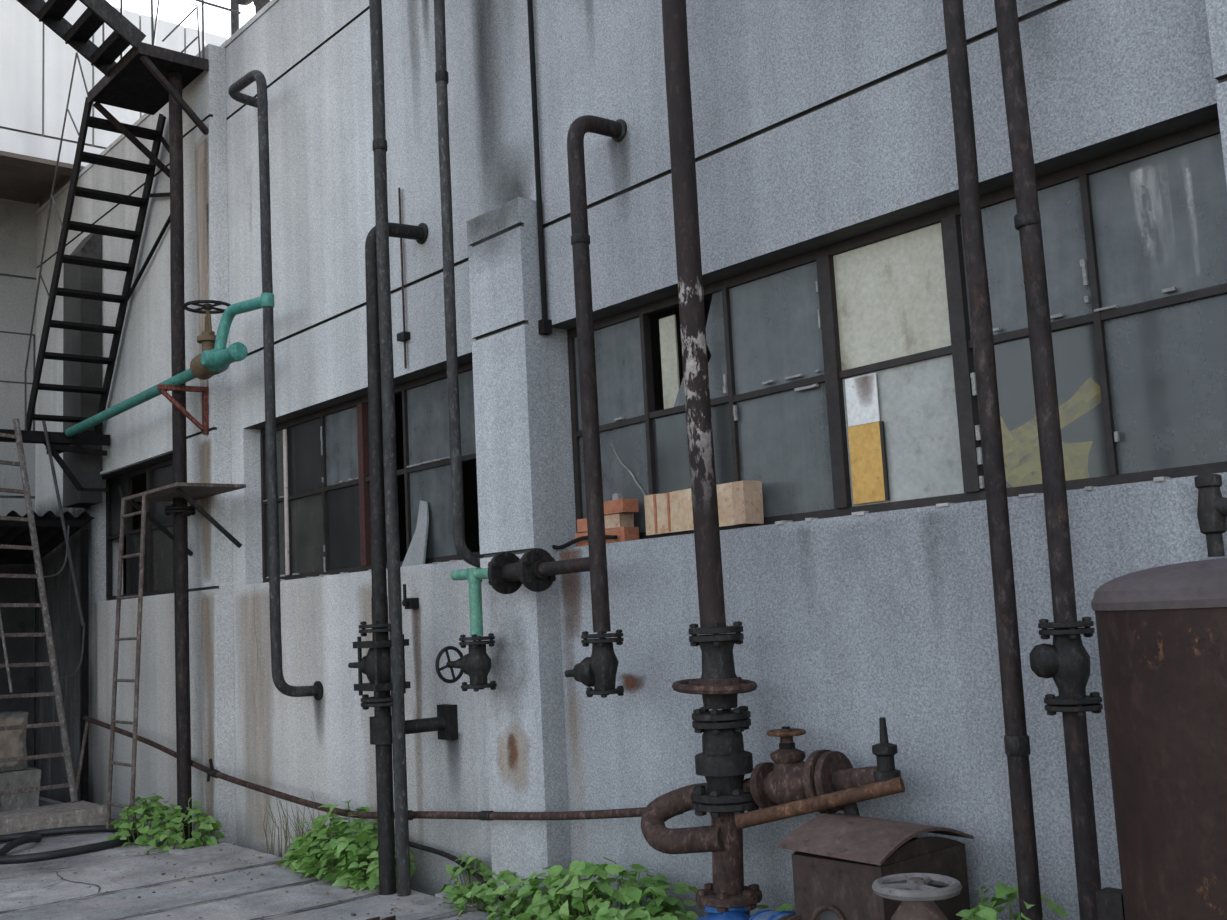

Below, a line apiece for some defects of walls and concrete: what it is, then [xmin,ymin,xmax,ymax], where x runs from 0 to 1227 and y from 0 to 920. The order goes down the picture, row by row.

damp [478,0,494,107]
rust [624,675,640,690]
rust [500,736,523,777]